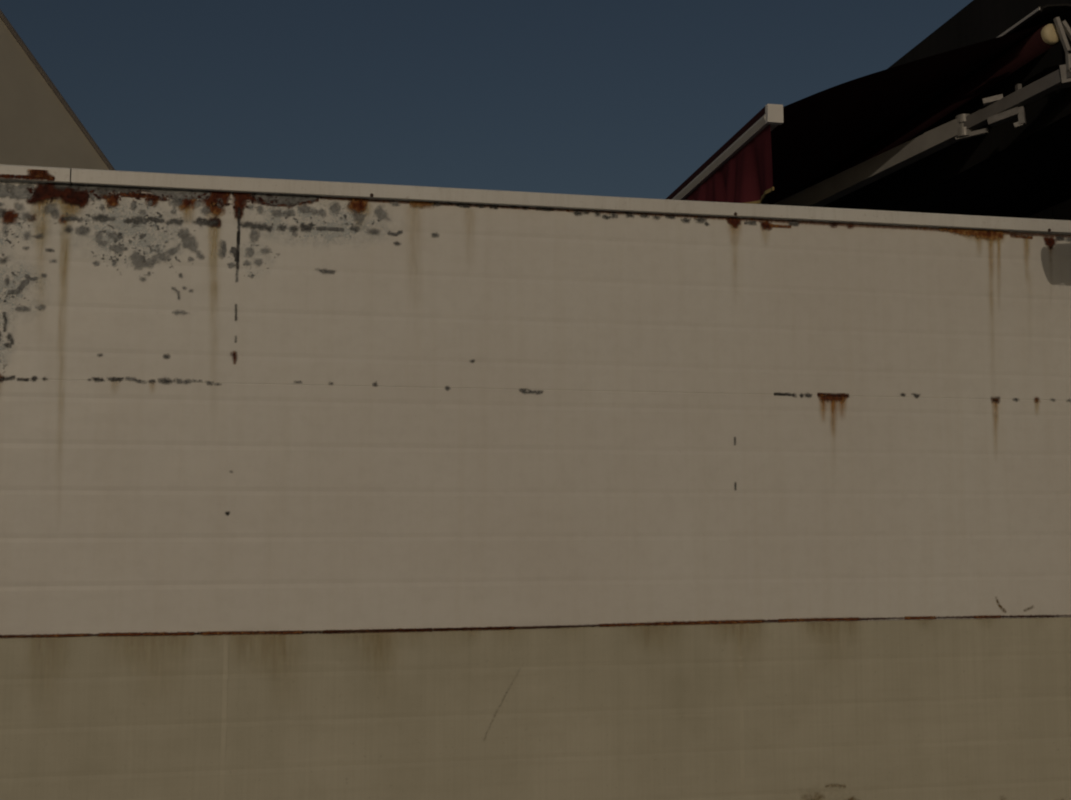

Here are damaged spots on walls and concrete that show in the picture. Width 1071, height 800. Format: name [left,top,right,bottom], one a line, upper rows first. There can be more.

peeling [220,193,402,278]
peeling [0,183,222,381]
peeling [88,377,219,385]